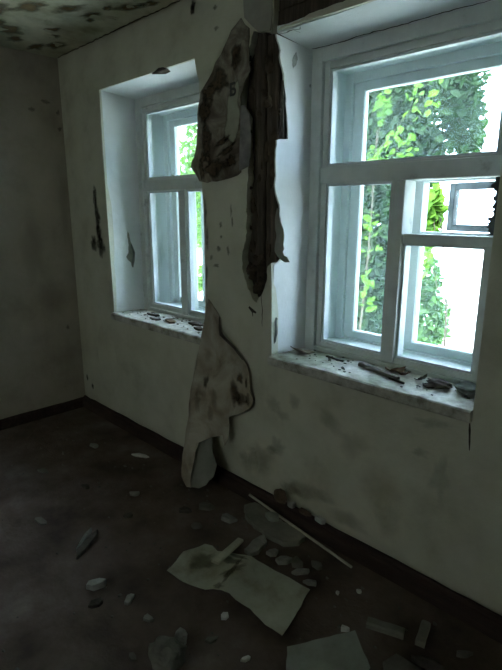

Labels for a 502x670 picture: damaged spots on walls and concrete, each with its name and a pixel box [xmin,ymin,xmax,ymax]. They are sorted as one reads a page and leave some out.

water stain [0,2,47,41]
water stain [57,1,159,22]
peeling [126,233,135,267]